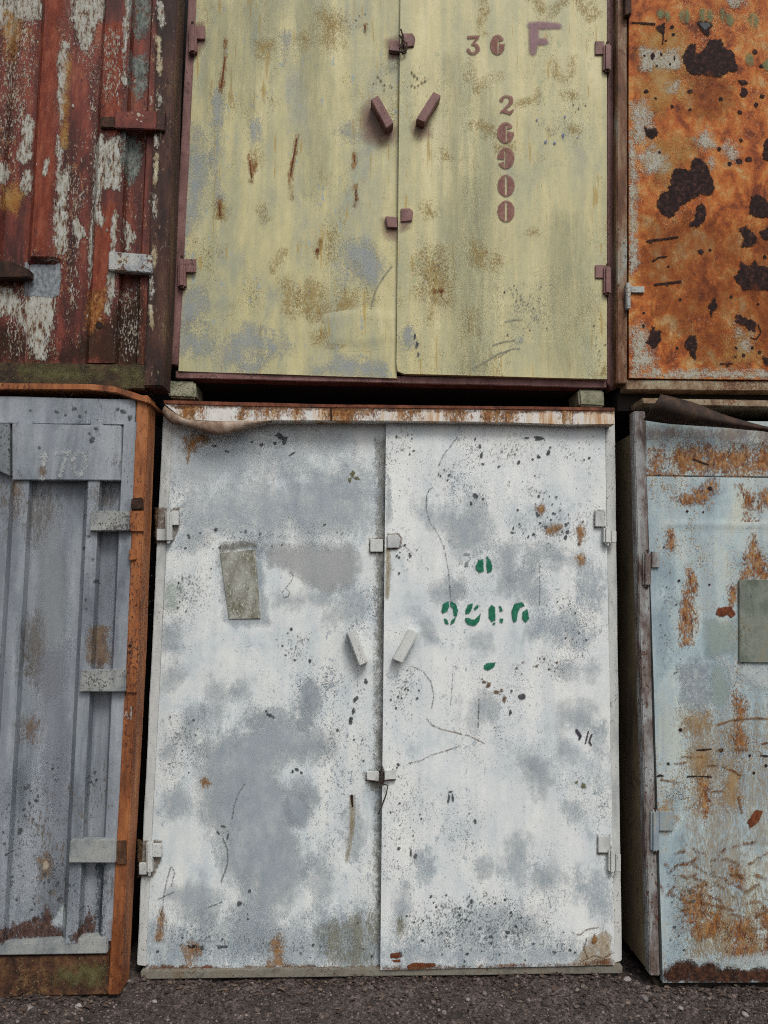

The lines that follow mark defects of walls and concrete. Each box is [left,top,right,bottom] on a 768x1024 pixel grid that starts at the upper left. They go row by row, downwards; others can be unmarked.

corrosion [738,80,765,107]
peeling [0,0,166,361]
corrosion [171,404,613,424]
corrosion [184,433,210,462]
corrosion [536,504,563,536]
corrosion [575,524,586,566]
corrosion [647,441,768,618]
corrosion [677,567,711,647]
corrosion [678,689,768,822]
corrosion [747,810,763,828]
corrosion [663,882,768,983]